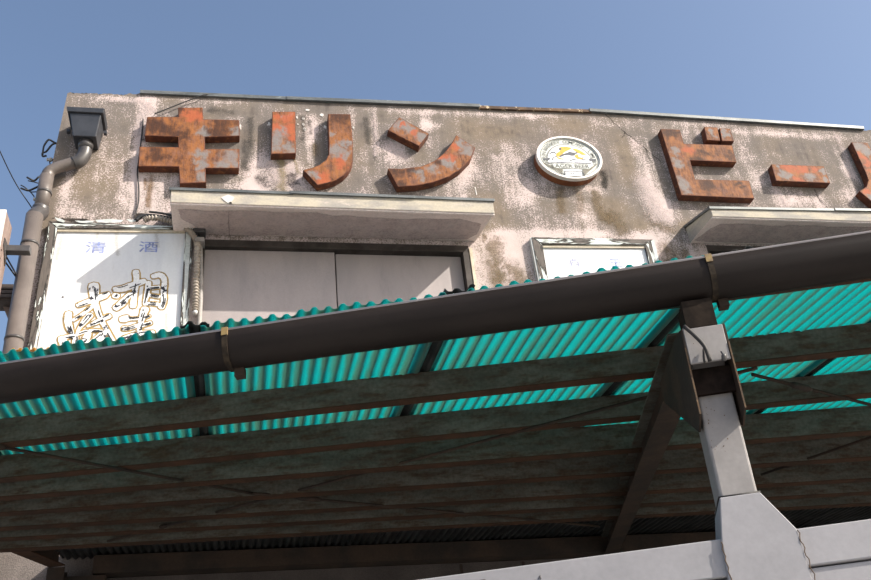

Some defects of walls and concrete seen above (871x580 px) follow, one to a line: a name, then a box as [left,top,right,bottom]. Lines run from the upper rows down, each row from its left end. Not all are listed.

water stain [110,98,163,143]
water stain [179,210,524,287]